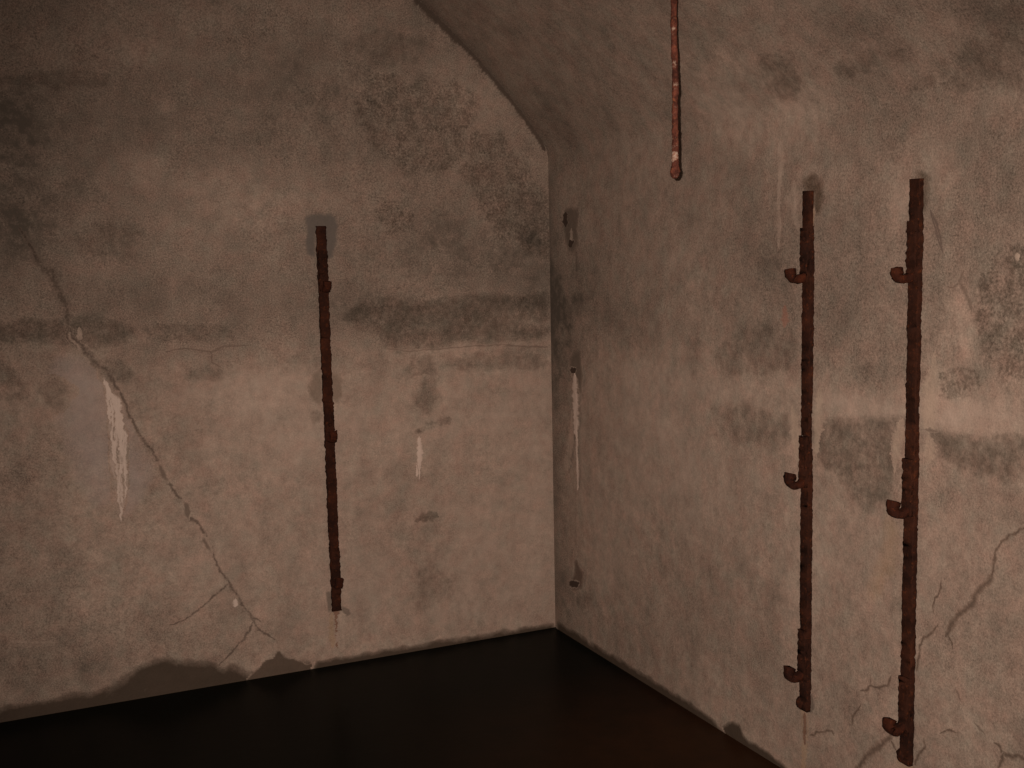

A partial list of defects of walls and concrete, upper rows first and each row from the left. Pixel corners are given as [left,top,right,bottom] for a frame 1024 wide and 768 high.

damp [0,308,235,521]
crack [17,226,276,668]
damp [415,436,425,479]
damp [563,373,580,490]
damp [0,653,258,723]
crack [810,526,1024,737]
crack [853,688,1024,768]